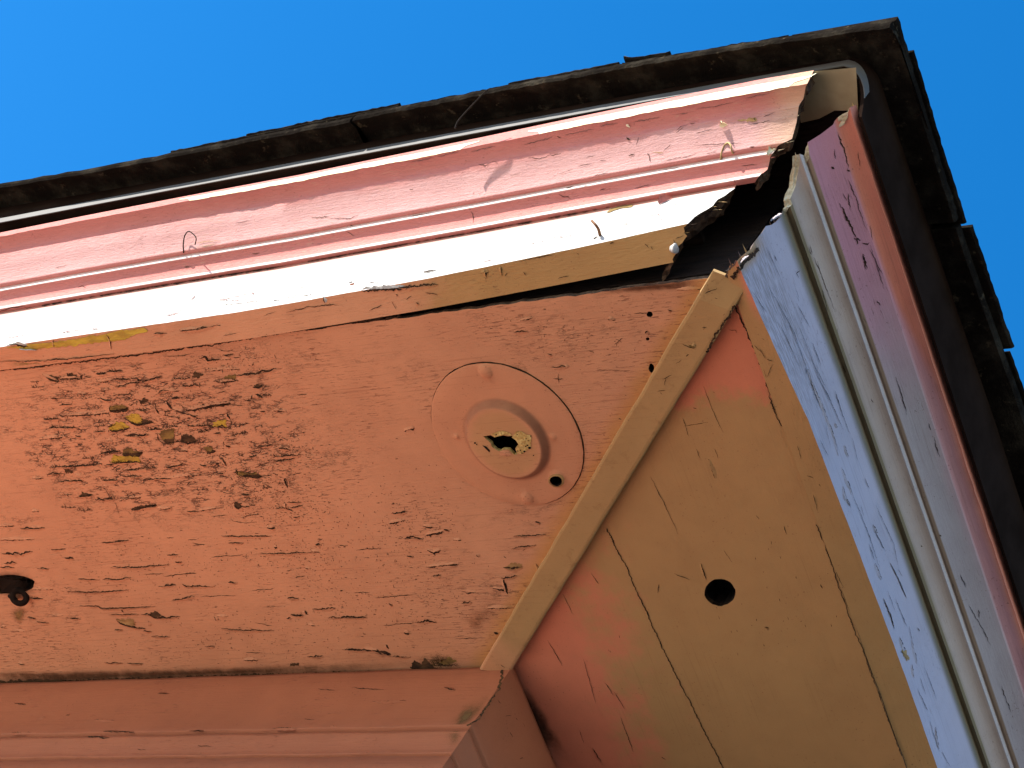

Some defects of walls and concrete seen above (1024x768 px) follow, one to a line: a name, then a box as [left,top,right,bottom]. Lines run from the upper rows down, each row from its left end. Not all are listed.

peeling [690,112,775,153]
crack [831,135,860,200]
peeling [839,180,872,245]
peeling [32,355,322,534]
crack [0,137,723,768]
spalling [474,434,534,456]
peeling [487,557,539,609]
peeling [80,605,180,639]
peeling [410,657,473,669]